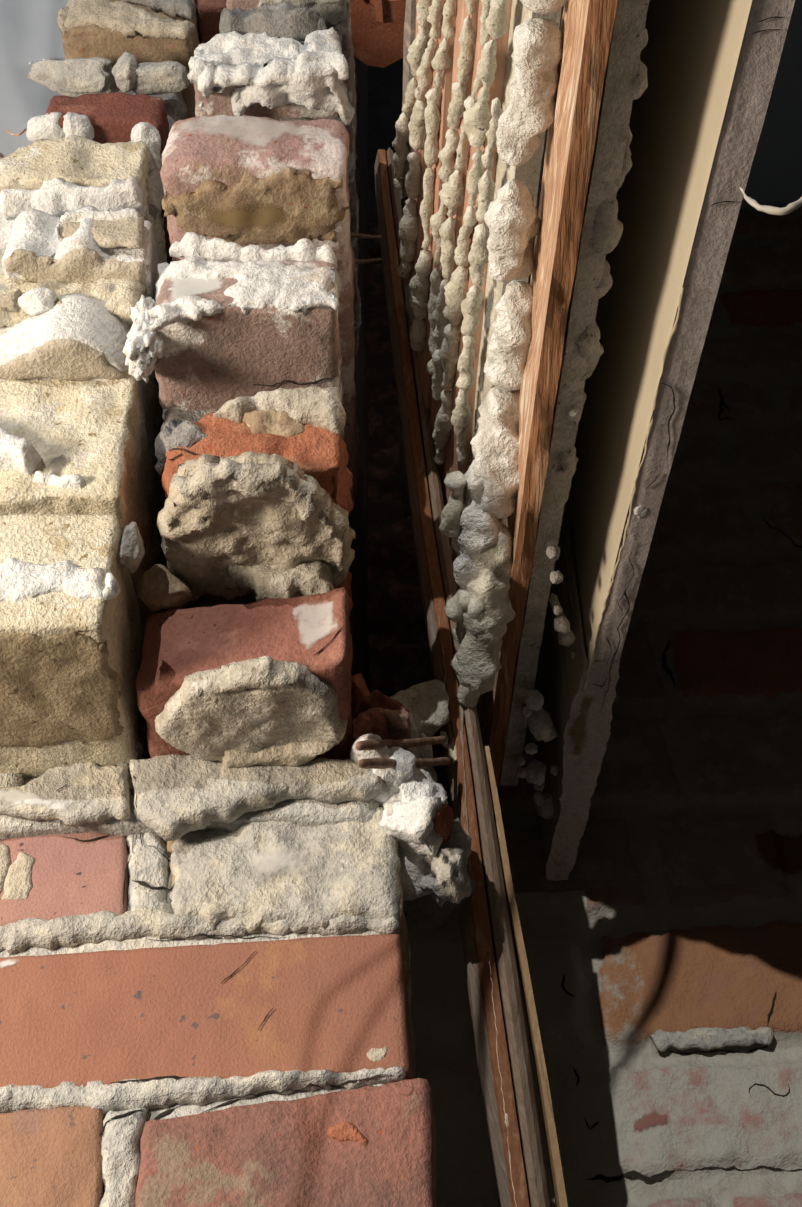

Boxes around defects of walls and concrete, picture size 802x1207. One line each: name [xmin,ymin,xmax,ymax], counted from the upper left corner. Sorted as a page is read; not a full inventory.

crack [646,383,675,489]
crack [593,544,634,712]
crack [148,933,286,983]
crack [655,992,776,1054]
crack [749,1083,790,1097]
crack [586,1165,802,1183]